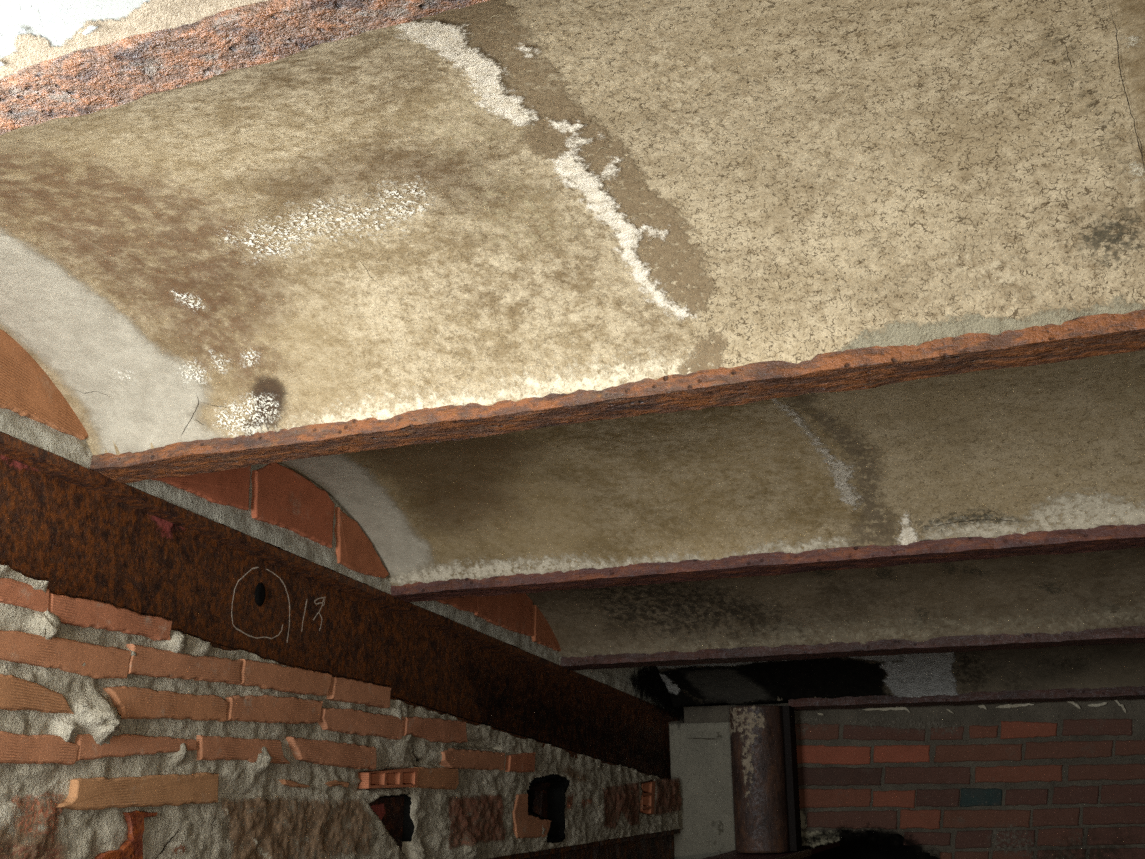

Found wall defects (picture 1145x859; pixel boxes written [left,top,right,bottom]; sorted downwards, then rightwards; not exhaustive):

peeling [0,0,269,79]
water stain [513,0,650,95]
water stain [633,33,726,160]
crack [1109,4,1145,169]
water stain [383,20,697,319]
water stain [846,240,1052,303]
water stain [213,348,718,436]
water stain [772,398,861,510]
water stain [388,553,704,586]
water stain [726,537,848,558]
water stain [898,492,1145,545]
water stain [596,586,1145,655]